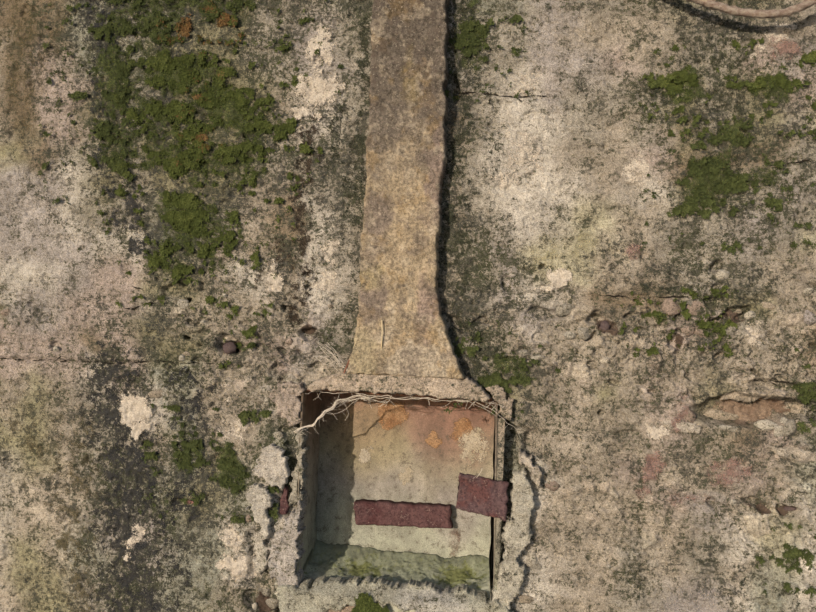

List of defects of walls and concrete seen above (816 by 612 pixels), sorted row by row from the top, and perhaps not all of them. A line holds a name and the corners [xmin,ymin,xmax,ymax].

crack [0,356,215,365]
water stain [6,334,221,612]
peeling [216,372,514,596]
peeling [491,448,543,612]